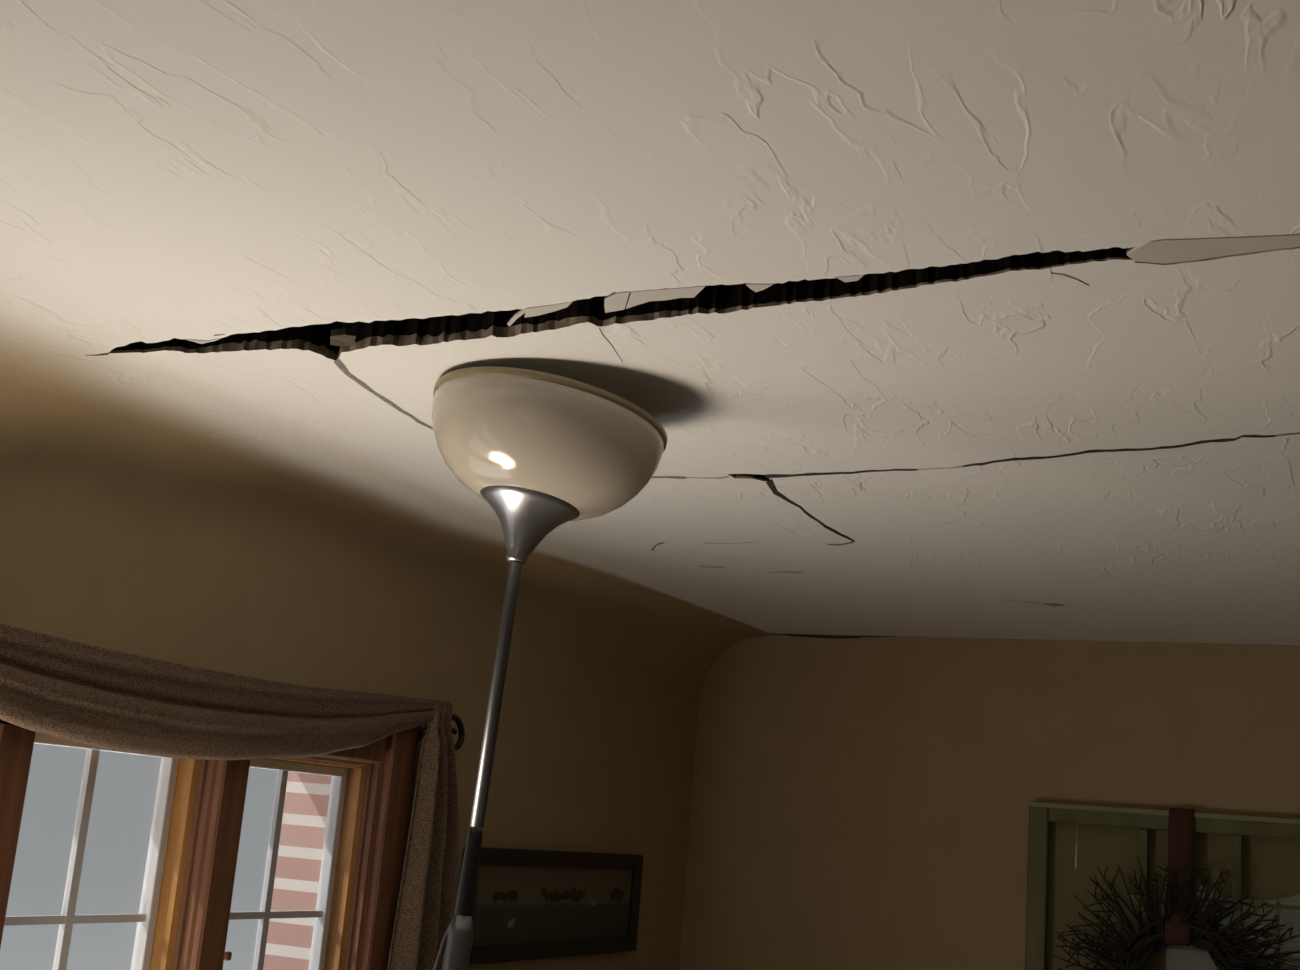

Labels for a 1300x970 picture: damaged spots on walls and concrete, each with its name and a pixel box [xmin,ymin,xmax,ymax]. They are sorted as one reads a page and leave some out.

crack [86,234,1300,430]
crack [652,432,1300,547]